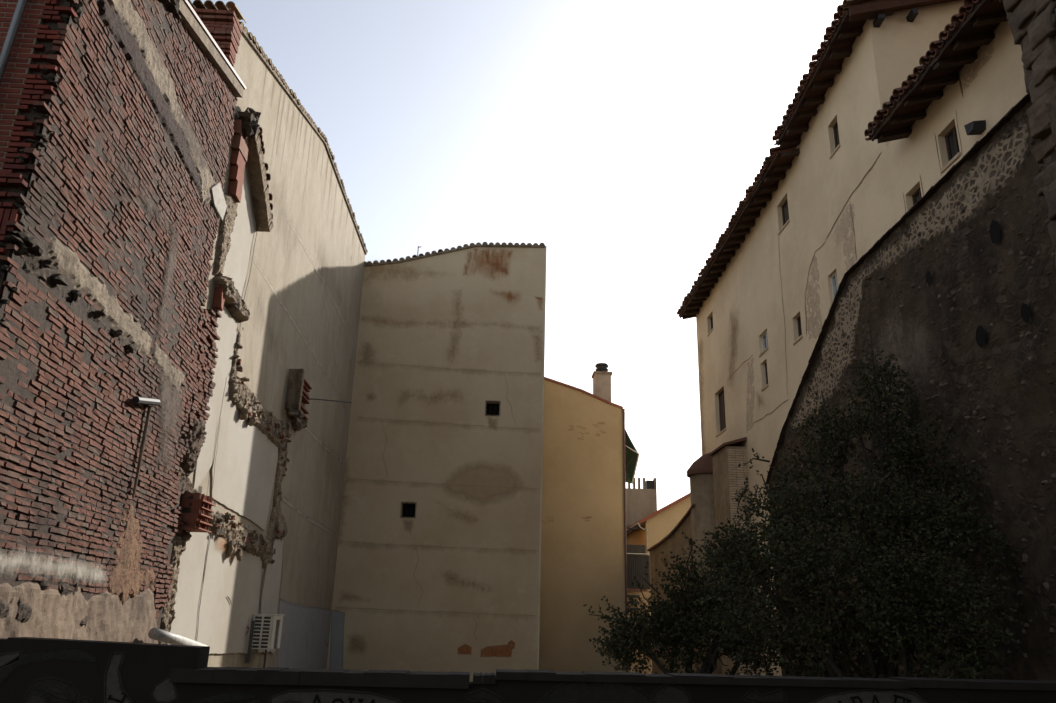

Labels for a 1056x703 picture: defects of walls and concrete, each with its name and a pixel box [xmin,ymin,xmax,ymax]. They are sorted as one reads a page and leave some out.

spalling [259,127,273,220]
crack [779,153,881,369]
spalling [175,415,207,496]
spalling [208,329,308,569]
peeling [0,552,105,581]